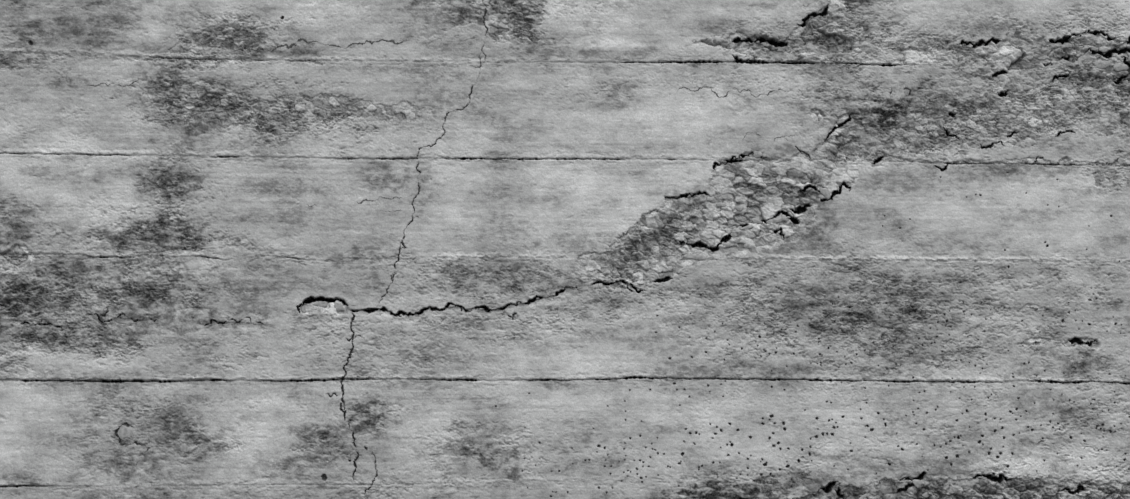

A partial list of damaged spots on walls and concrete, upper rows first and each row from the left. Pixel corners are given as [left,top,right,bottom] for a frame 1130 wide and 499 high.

crack [239,36,442,51]
spalling [575,0,1130,290]
crack [329,0,643,498]
spalling [1022,302,1122,349]
spalling [585,352,1130,499]